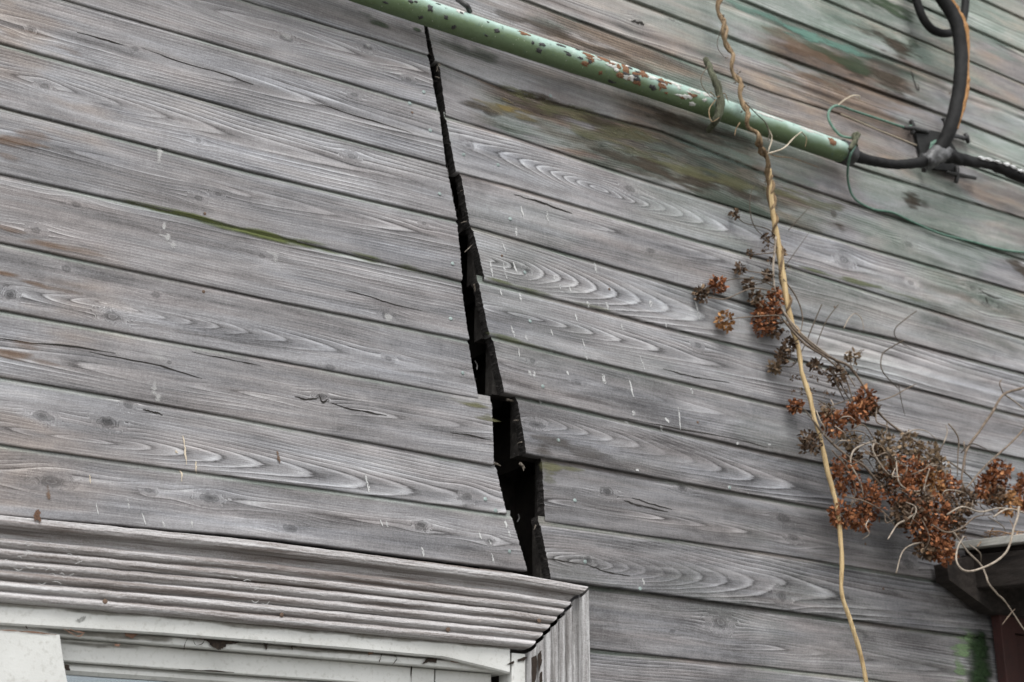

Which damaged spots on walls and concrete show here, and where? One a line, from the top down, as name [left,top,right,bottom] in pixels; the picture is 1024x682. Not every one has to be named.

crack [424,26,551,579]
corrosion [581,52,698,99]